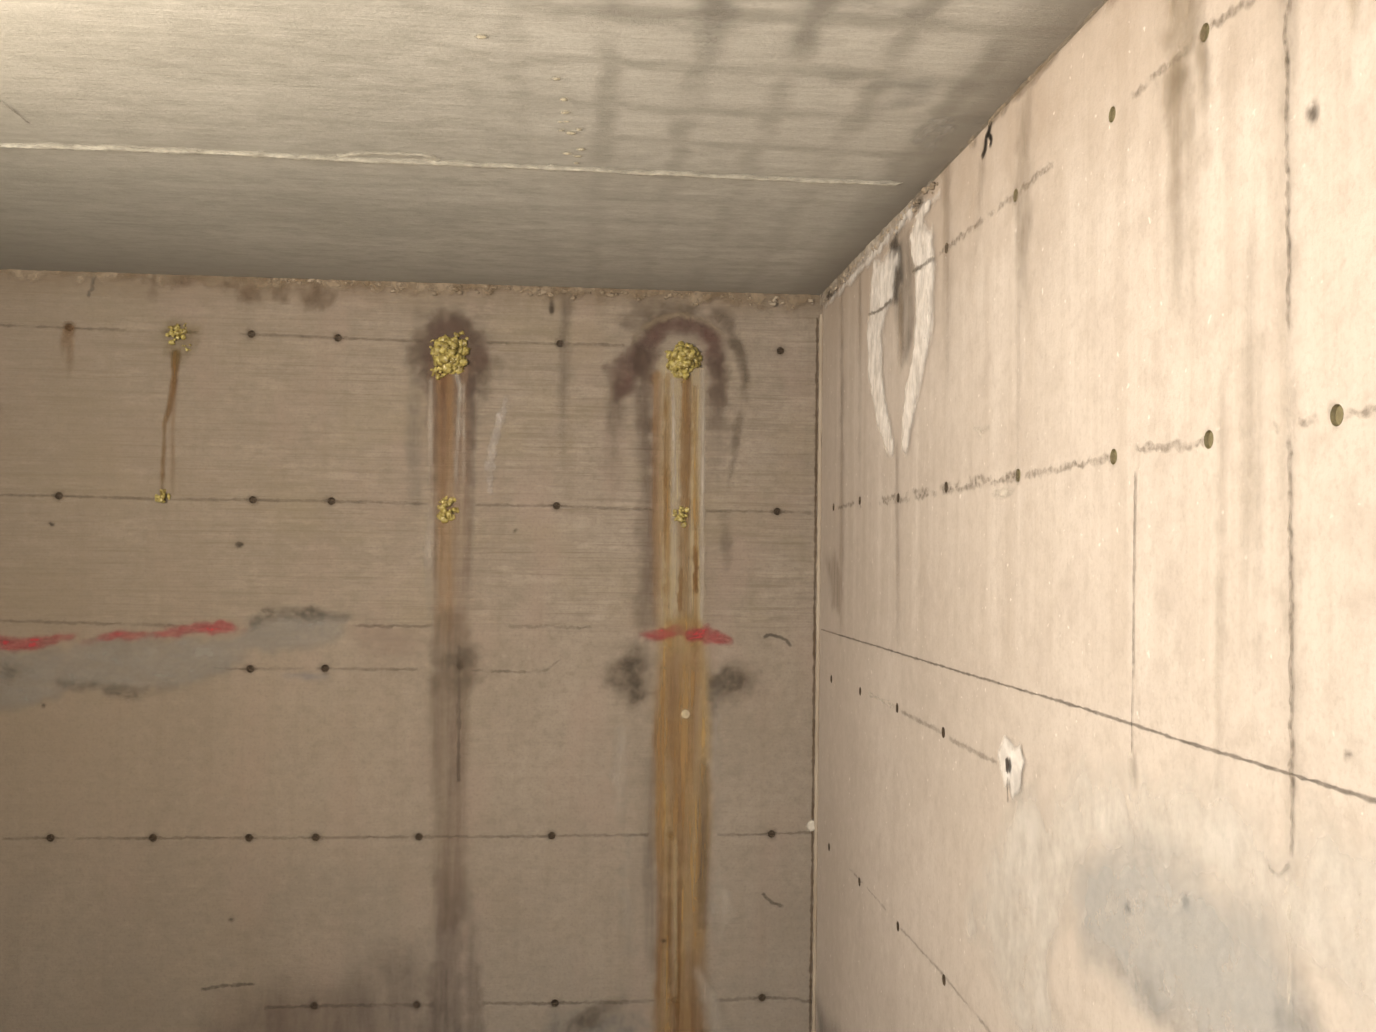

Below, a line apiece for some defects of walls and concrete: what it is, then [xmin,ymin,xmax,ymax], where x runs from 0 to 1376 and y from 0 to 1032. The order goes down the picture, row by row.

crack [1284,210,1292,292]
corrosion [164,350,179,429]
damp [616,314,743,400]
damp [867,228,933,454]
corrosion [654,371,708,1032]